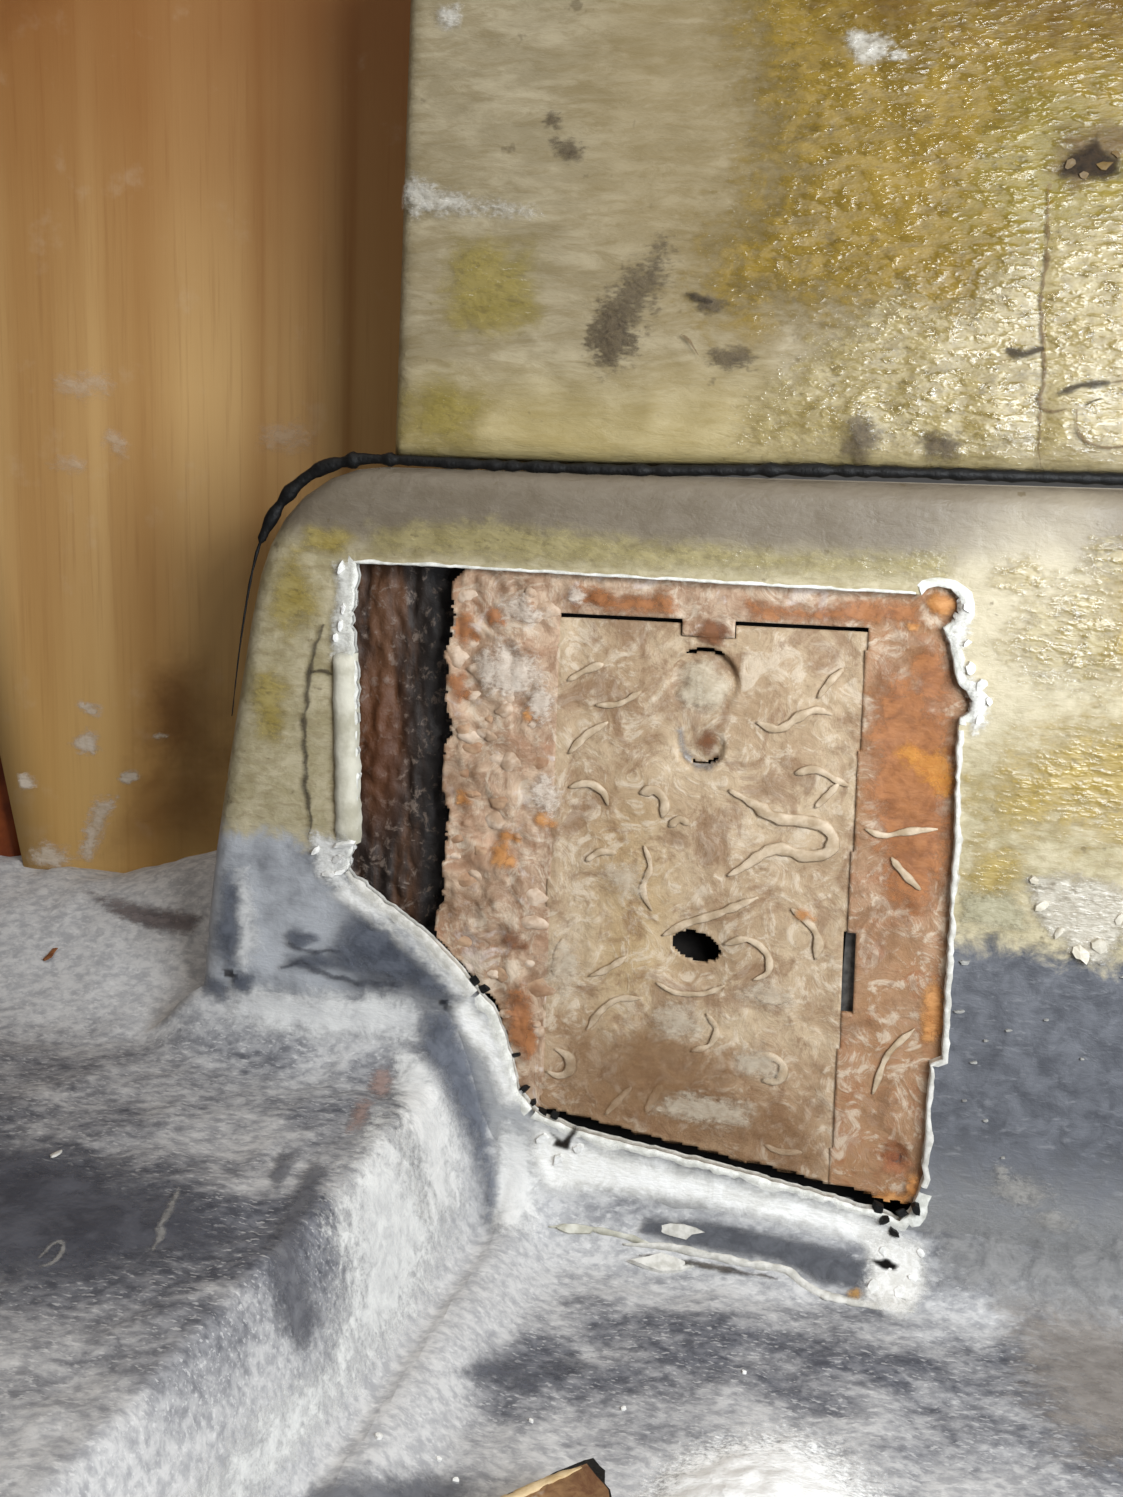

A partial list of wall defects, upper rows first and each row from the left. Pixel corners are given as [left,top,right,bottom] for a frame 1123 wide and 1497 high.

damp [698,0,1123,332]
damp [586,241,667,366]
damp [708,346,750,368]
crack [1006,191,1123,465]
damp [843,417,883,465]
corrosion [700,620,727,645]
corrosion [746,593,957,631]
corrosion [866,652,953,915]
damp [994,724,1123,842]
peeling [961,875,1123,965]
corrosion [921,984,944,1042]
corrosion [874,1175,918,1204]